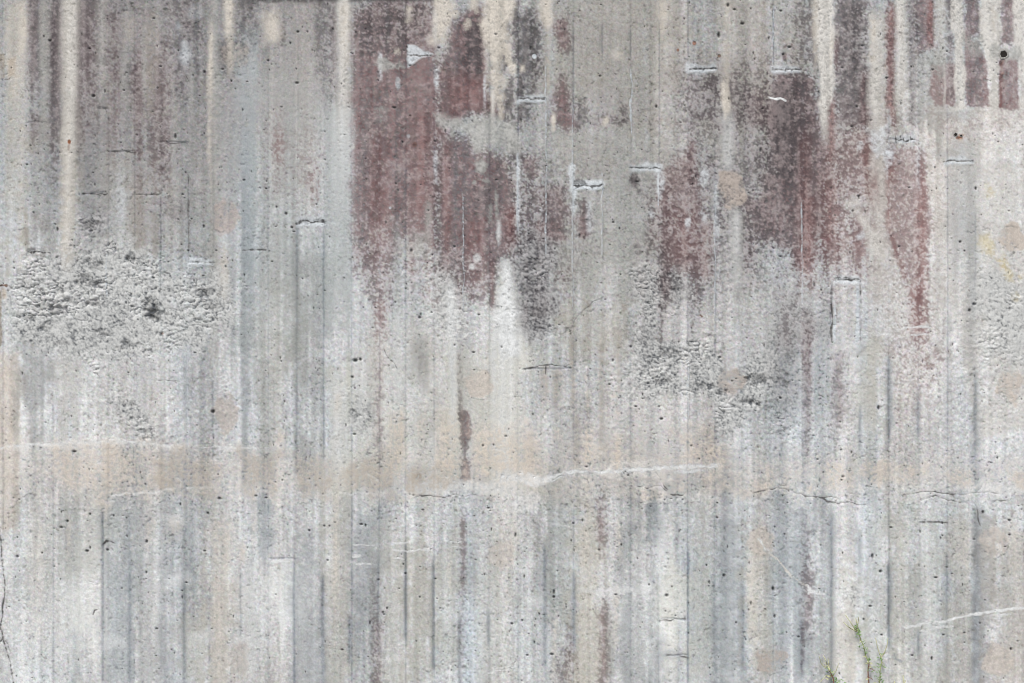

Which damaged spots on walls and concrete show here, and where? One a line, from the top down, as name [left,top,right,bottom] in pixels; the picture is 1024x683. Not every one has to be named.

rust [998,59,1008,96]
crack [637,471,684,496]
crack [752,484,868,505]